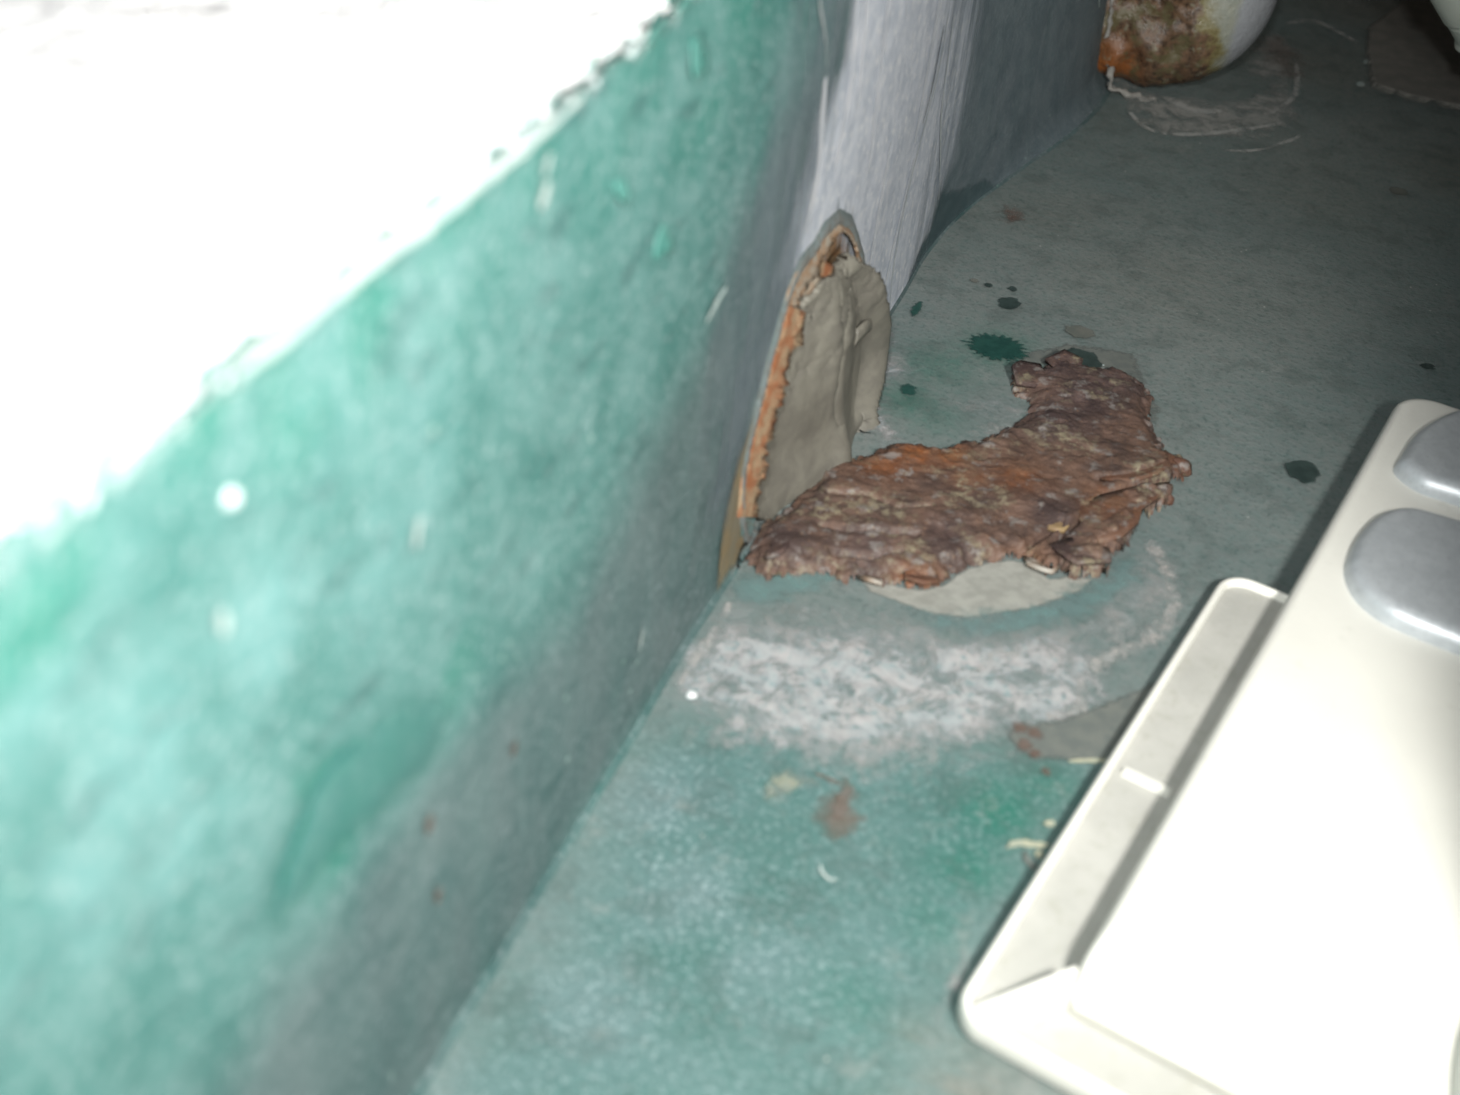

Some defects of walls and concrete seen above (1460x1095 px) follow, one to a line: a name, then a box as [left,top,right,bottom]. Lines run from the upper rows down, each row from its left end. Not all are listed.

spalling [737,224,862,518]
rust [719,349,1192,590]
water stain [679,540,1180,762]